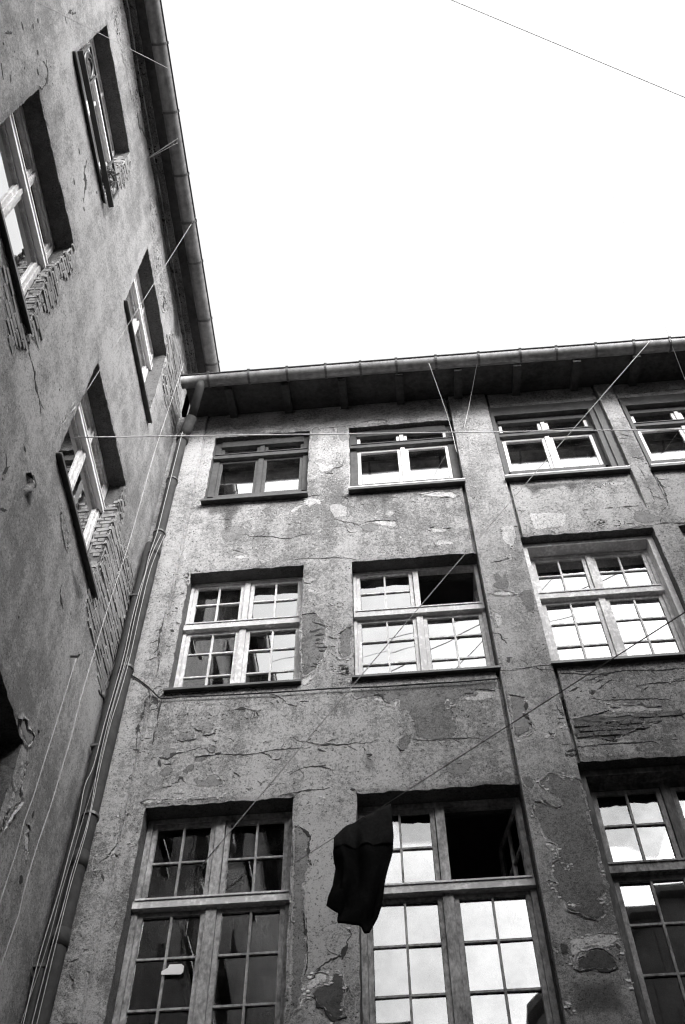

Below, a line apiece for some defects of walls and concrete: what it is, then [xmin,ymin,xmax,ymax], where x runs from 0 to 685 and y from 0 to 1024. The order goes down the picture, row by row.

flaking render [0,712,40,839]
crack [128,592,375,796]
crack [406,733,490,764]
flaking render [298,611,684,990]
flaking render [287,824,347,1024]